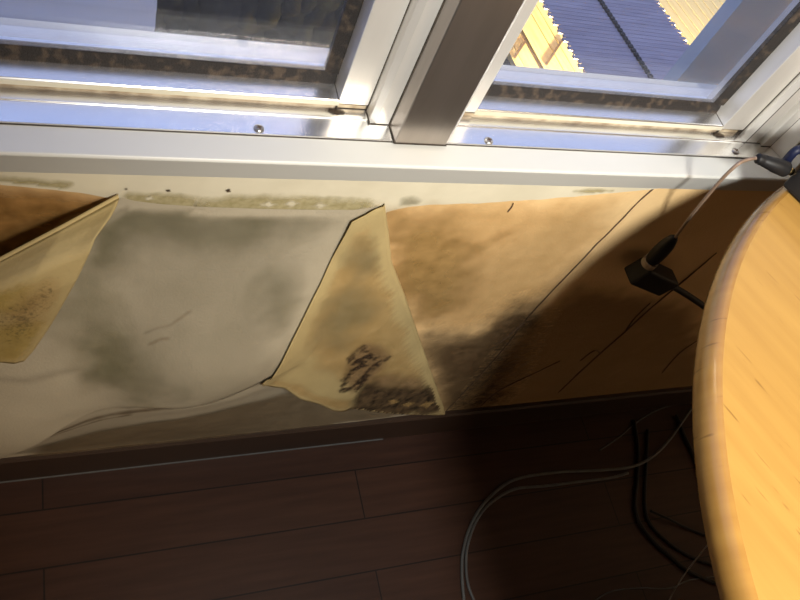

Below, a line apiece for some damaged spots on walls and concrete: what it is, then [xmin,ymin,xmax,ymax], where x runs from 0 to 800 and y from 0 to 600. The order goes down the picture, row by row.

water stain [38,295,695,456]